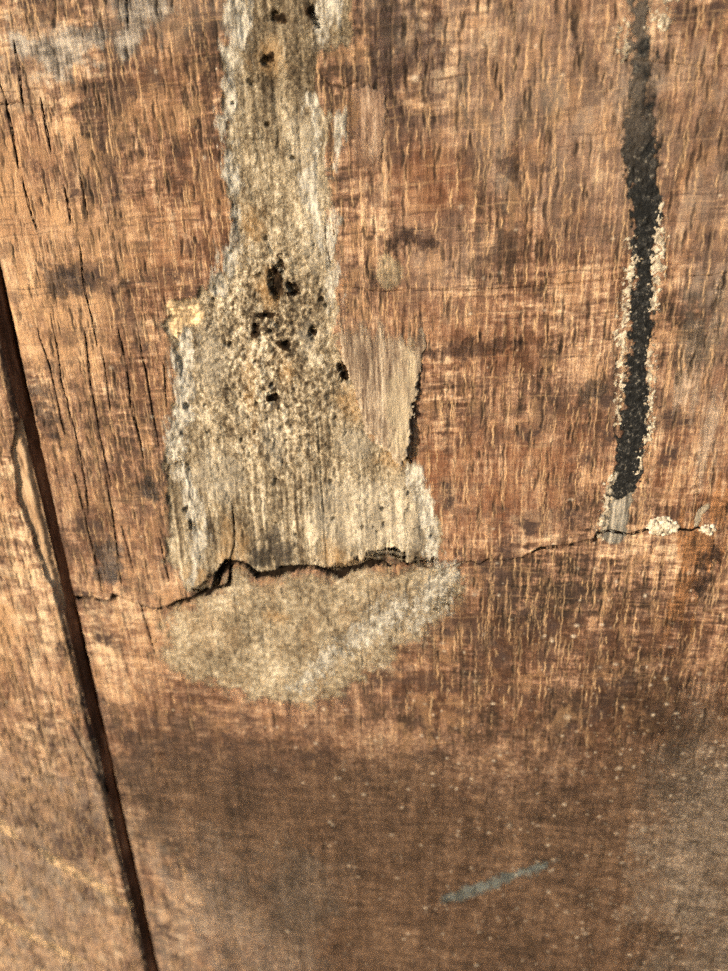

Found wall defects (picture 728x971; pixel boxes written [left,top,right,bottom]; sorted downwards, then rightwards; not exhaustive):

spalling [160,0,444,593]
crack [38,175,649,652]
damp [579,0,679,544]
crack [673,525,700,533]